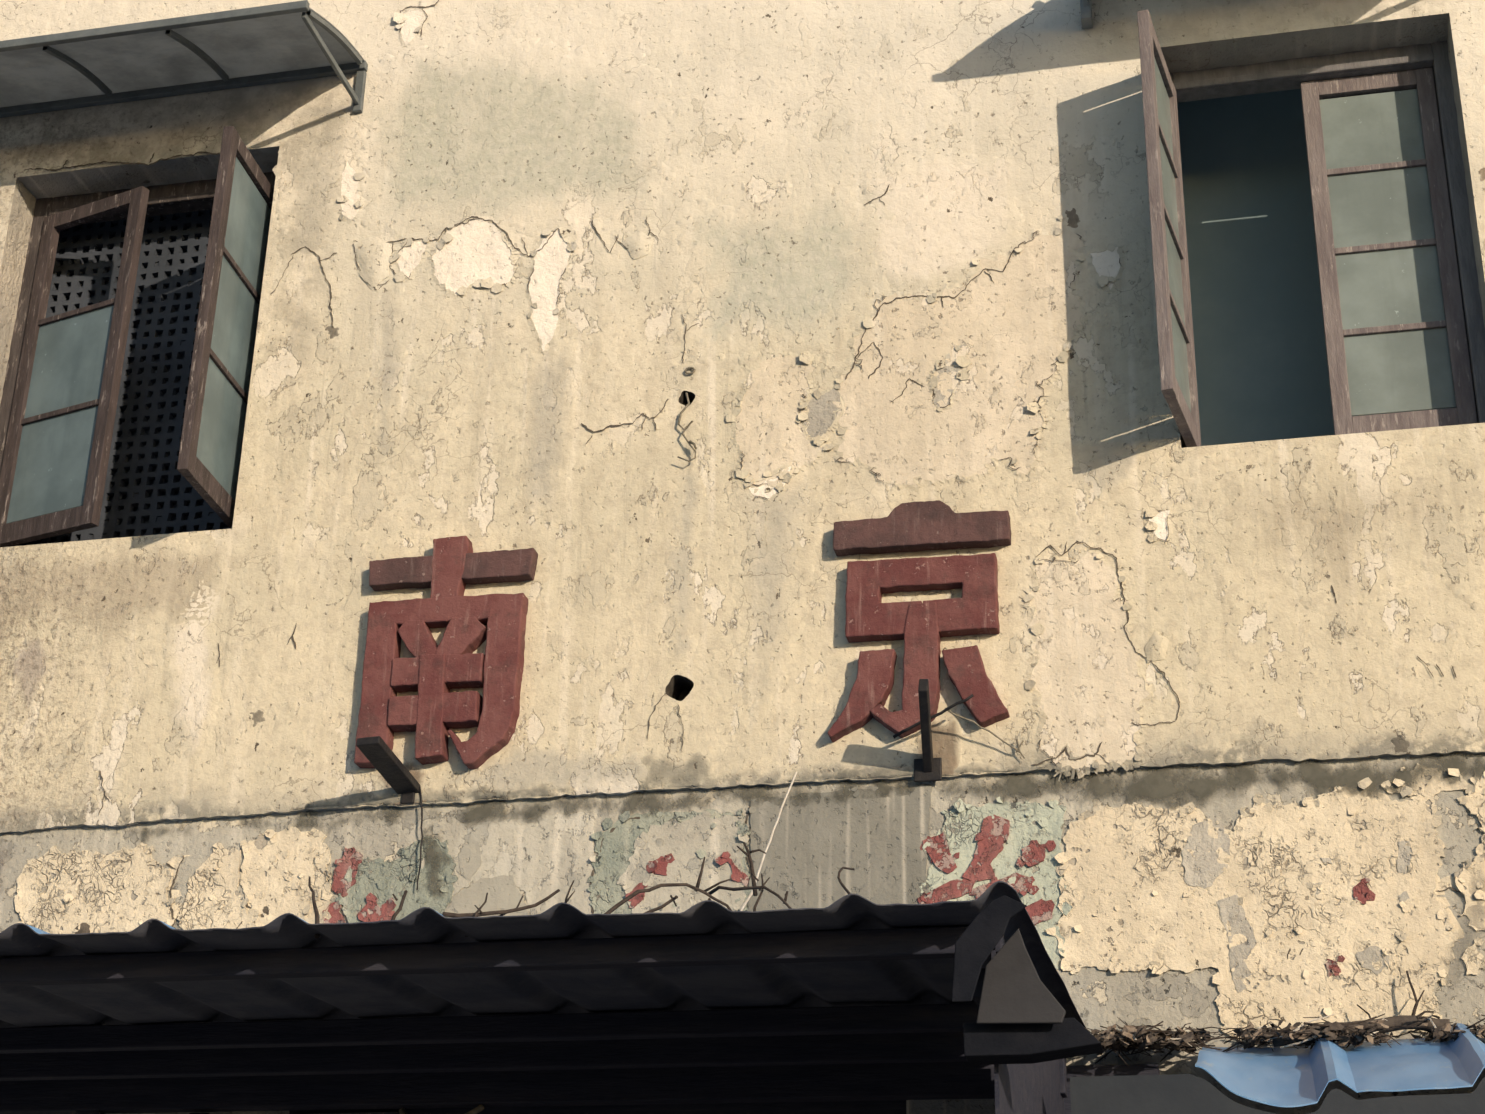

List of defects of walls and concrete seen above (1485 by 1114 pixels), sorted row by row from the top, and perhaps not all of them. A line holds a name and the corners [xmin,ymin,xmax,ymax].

peeling [393,7,427,48]
leakage [272,34,677,287]
crack [267,215,556,328]
peeling [388,218,578,354]
crack [591,216,666,254]
crack [840,250,1015,402]
crack [581,393,669,445]
peeling [1019,548,1154,782]
crack [1032,533,1191,726]
crack [1030,742,1110,765]
peeling [3,763,1485,1042]